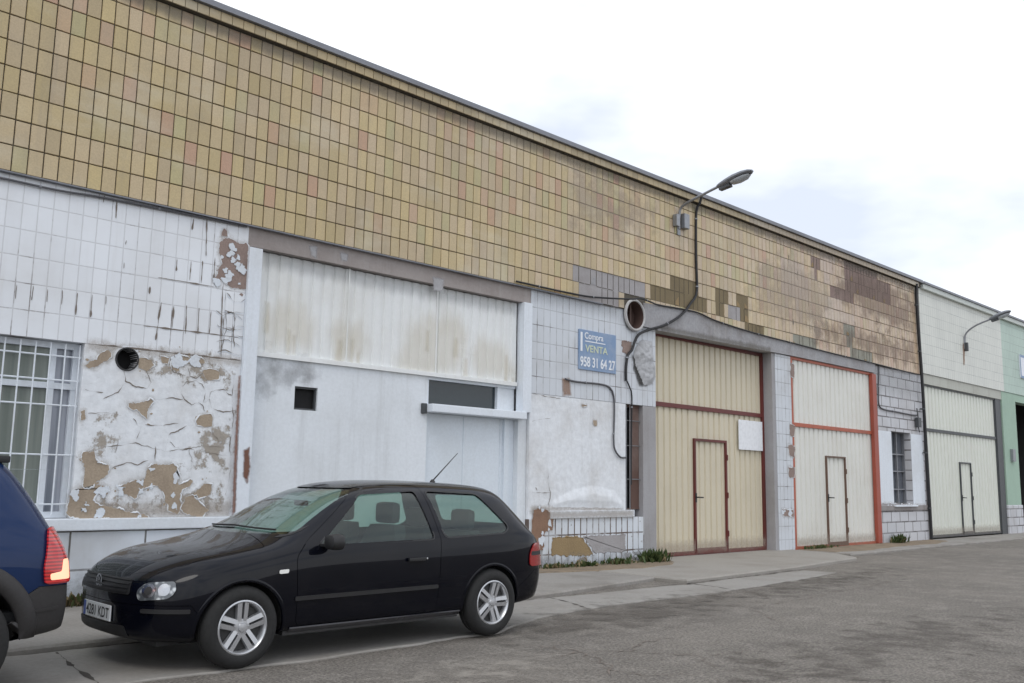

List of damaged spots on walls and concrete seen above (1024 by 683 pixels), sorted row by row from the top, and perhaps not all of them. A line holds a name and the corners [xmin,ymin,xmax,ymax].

spalling [213,228,250,296]
peeling [573,265,764,335]
peeling [830,260,891,305]
spalling [85,350,112,368]
crack [85,219,245,491]
spalling [138,346,220,381]
peeling [843,323,872,362]
spalling [127,389,155,424]
spalling [195,410,213,433]
rust [232,376,250,515]
spalling [66,451,213,519]
spalling [532,506,641,562]